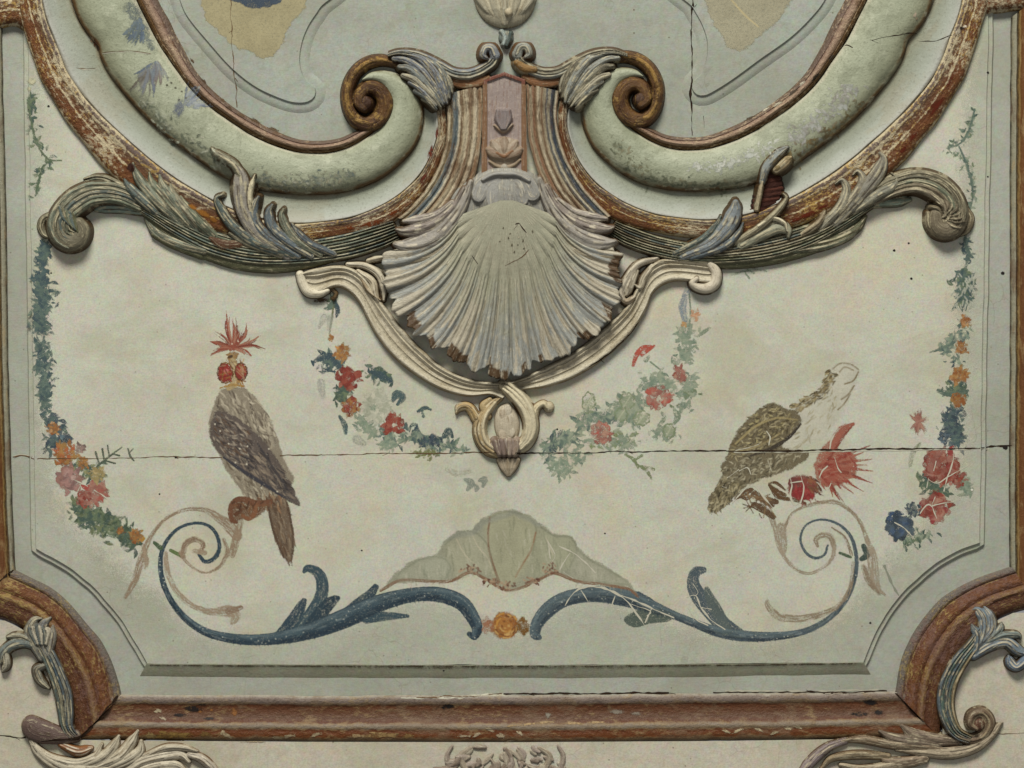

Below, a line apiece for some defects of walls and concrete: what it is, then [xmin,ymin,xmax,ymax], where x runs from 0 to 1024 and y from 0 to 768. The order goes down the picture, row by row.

crack [230,0,238,106]
crack [689,0,704,135]
crack [14,452,222,460]
crack [280,445,1012,456]